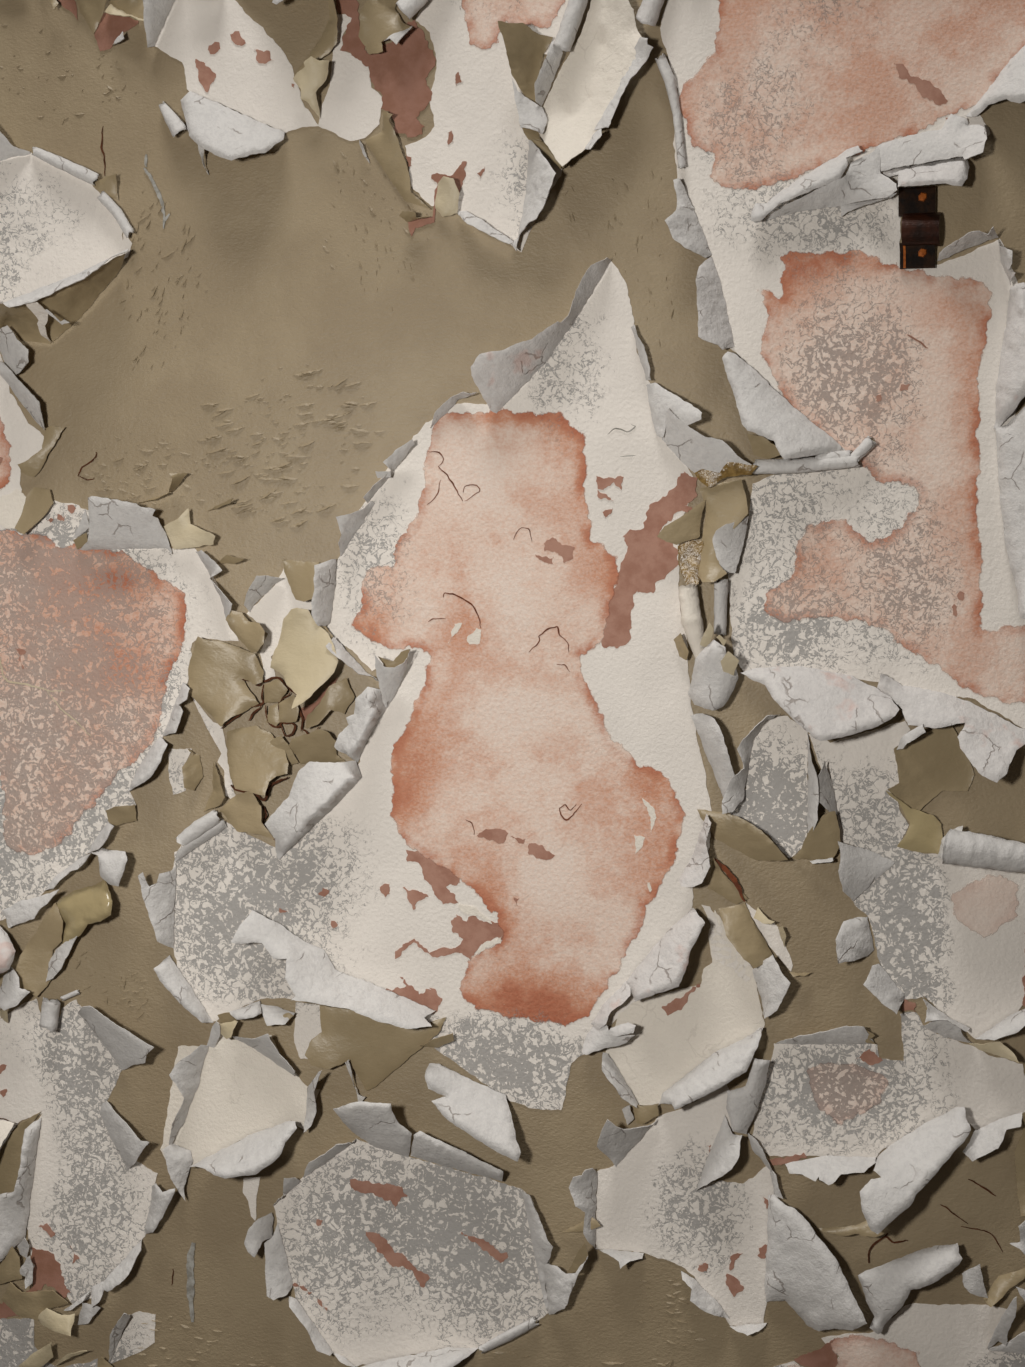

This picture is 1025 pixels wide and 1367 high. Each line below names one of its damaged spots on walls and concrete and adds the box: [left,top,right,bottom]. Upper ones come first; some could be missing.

water stain [461,0,565,49]
water stain [679,0,1025,190]
water stain [0,418,12,489]
water stain [0,529,187,855]
peeling [0,132,338,1367]
water stain [352,409,686,1026]
peeling [655,0,1025,783]
water stain [760,250,1025,704]